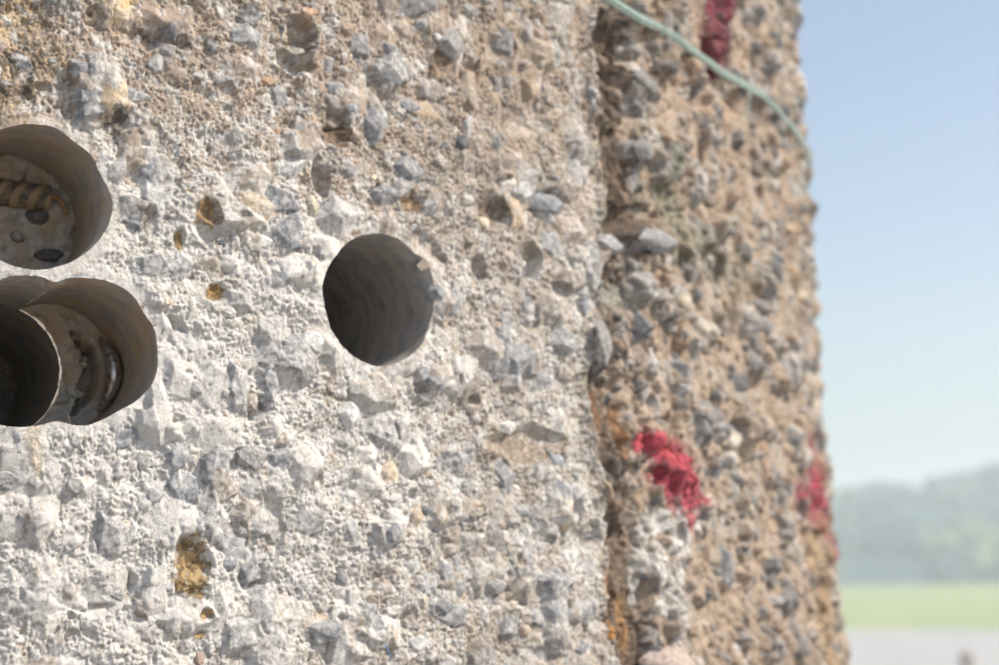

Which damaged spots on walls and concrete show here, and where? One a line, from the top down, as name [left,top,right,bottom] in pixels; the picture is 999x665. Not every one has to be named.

crack [569,1,665,665]
rust [588,388,632,461]
rust [603,569,629,657]